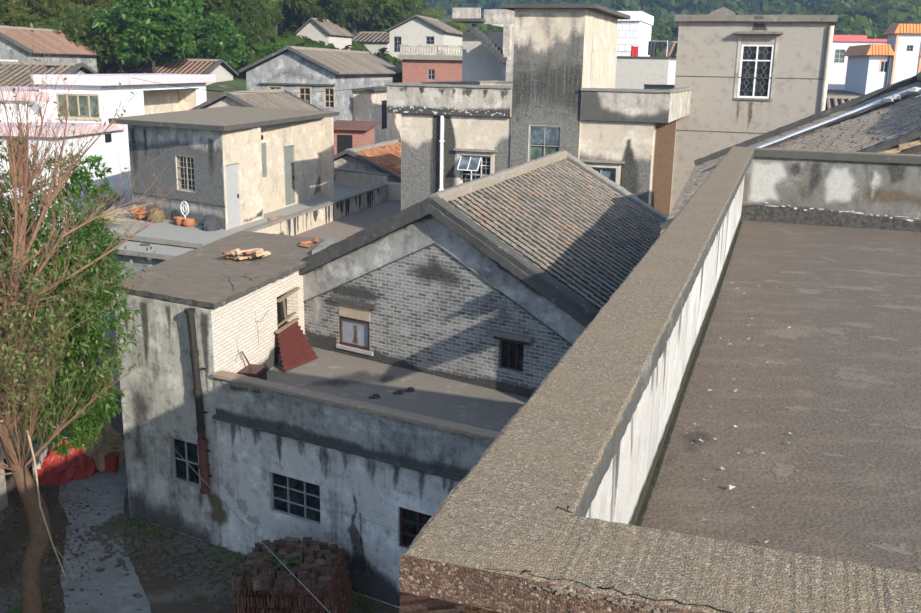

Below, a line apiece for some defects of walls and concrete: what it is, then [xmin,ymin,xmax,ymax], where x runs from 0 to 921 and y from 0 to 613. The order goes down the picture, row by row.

damp [387,31,669,211]
damp [89,128,226,230]
peeling [765,202,919,222]
damp [415,260,459,284]
spalling [762,262,921,317]
damp [140,302,149,361]
damp [134,393,147,430]
damp [216,408,469,491]
damp [130,495,211,543]
damp [345,496,400,607]